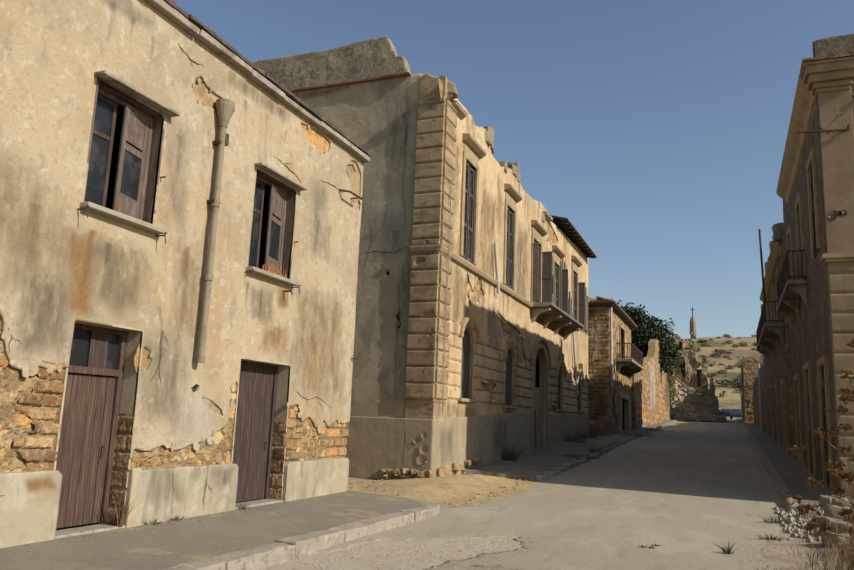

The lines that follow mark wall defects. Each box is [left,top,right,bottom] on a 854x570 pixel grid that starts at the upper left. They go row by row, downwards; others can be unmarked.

flaking render [192,77,221,112]
flaking render [301,124,331,155]
crack [362,101,408,298]
peeling [9,359,62,379]
flaking render [191,382,236,420]